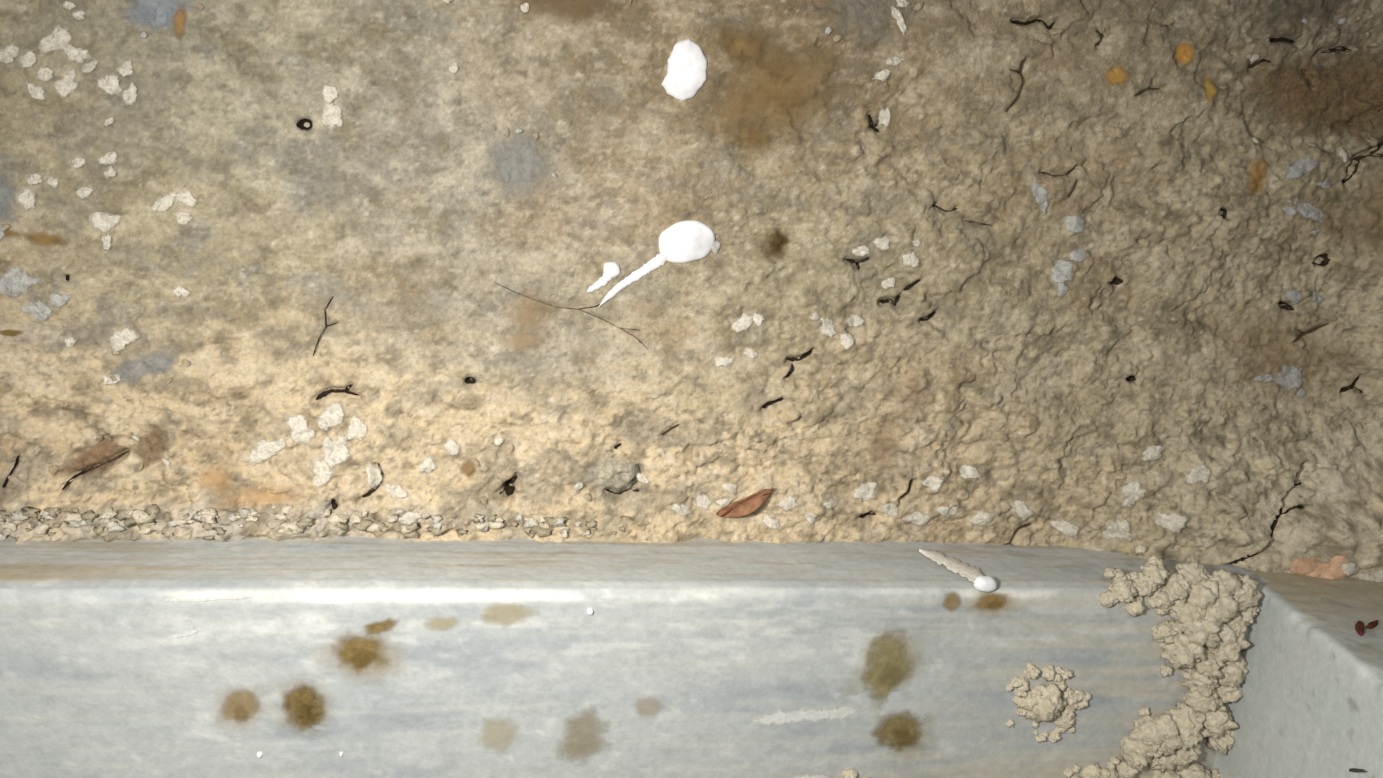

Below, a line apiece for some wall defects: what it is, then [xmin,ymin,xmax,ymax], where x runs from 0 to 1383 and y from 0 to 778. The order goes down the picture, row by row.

water stain [726,35,814,145]
water stain [339,620,393,667]
water stain [864,635,909,698]
water stain [224,693,255,719]
water stain [286,686,323,726]
water stain [874,713,919,749]